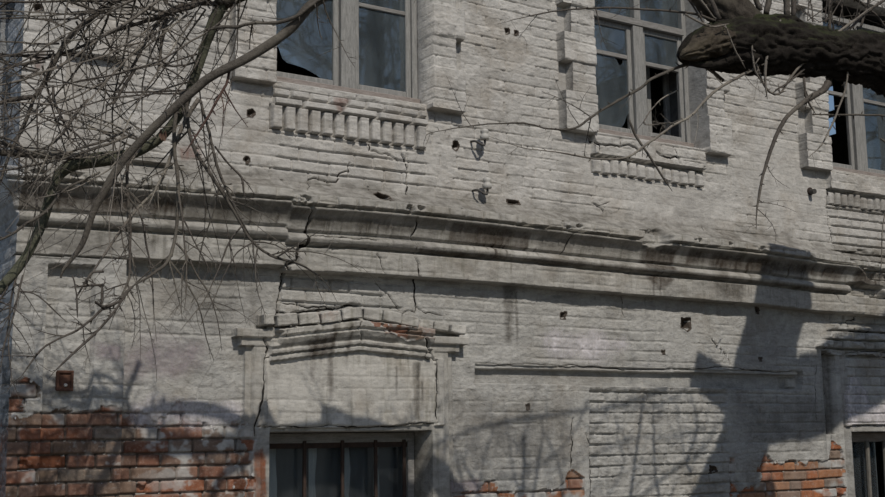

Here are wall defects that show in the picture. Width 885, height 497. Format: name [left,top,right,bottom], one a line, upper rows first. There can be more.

crack [275,166,441,336]
peeling [367,320,424,342]
crack [254,338,438,436]
peeling [5,376,257,497]
peeling [451,469,586,497]
peeling [728,440,847,497]